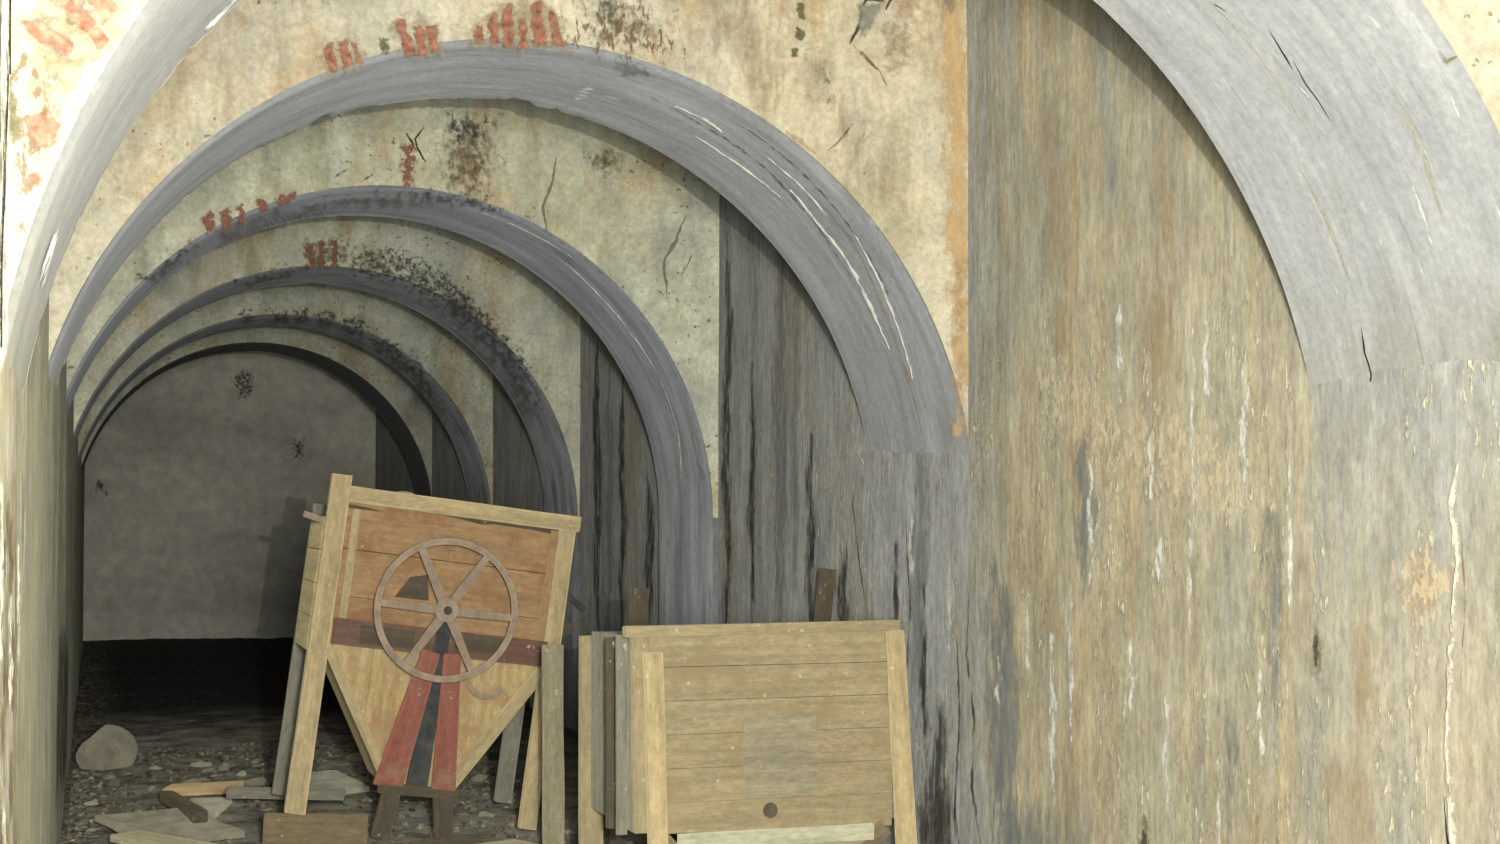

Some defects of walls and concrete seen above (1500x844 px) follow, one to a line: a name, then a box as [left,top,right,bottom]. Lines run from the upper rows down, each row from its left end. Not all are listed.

spalling [206,0,237,30]
flaking render [322,19,439,72]
flaking render [471,0,572,51]
peeling [849,0,906,85]
flaking render [0,0,121,369]
spalling [140,192,682,477]
water stain [894,457,1040,844]
water stain [1048,439,1096,804]
water stain [1186,319,1210,625]
water stain [1239,370,1250,498]
water stain [1256,652,1277,763]
water stain [1272,456,1293,626]